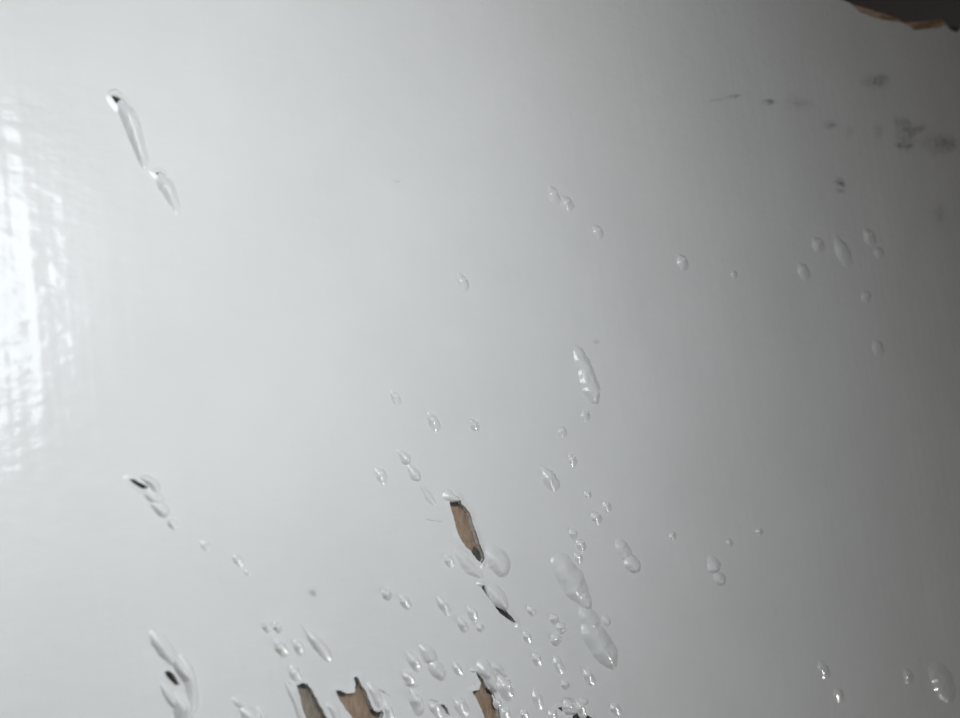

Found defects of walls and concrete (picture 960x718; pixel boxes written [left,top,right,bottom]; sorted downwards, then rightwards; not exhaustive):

peeling [425,489,521,629]
peeling [284,670,386,718]
peeling [466,658,504,718]